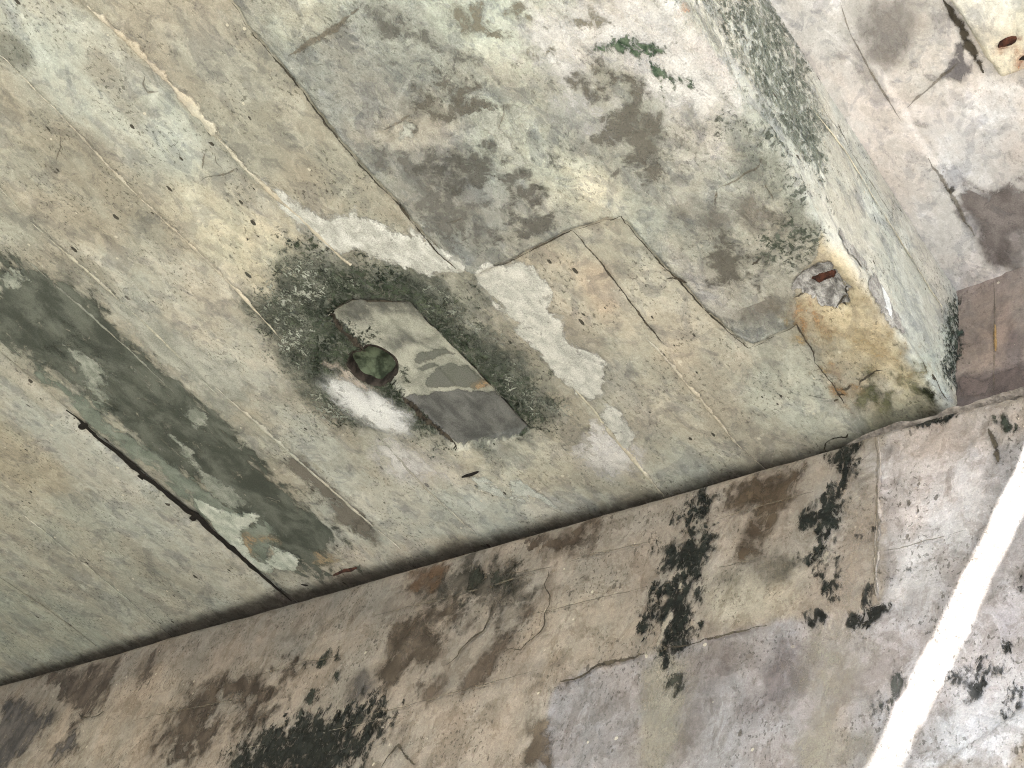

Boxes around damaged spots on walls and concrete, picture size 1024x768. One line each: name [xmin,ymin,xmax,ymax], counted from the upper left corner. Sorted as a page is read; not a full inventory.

crack [232,3,456,269]
water stain [352,2,442,53]
water stain [453,1,511,39]
water stain [504,2,532,20]
water stain [526,0,739,186]
water stain [264,49,642,476]
crack [483,216,881,404]
spalling [790,261,851,308]
water stain [0,250,892,768]
crack [350,540,655,720]